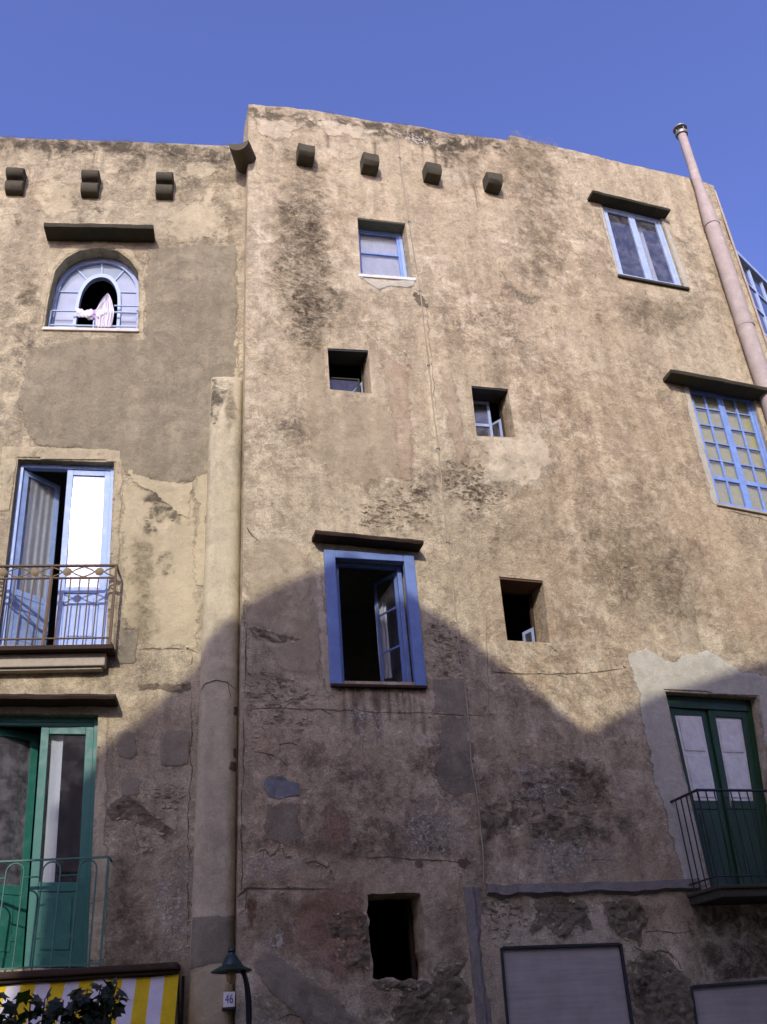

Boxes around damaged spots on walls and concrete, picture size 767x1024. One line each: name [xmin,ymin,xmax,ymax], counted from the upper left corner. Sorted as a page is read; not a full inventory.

spalling [210,378,225,424]
flaking render [128,470,193,533]
crack [143,602,626,947]
spalling [107,789,186,840]
spalling [487,895,592,944]
spalling [602,898,694,1024]